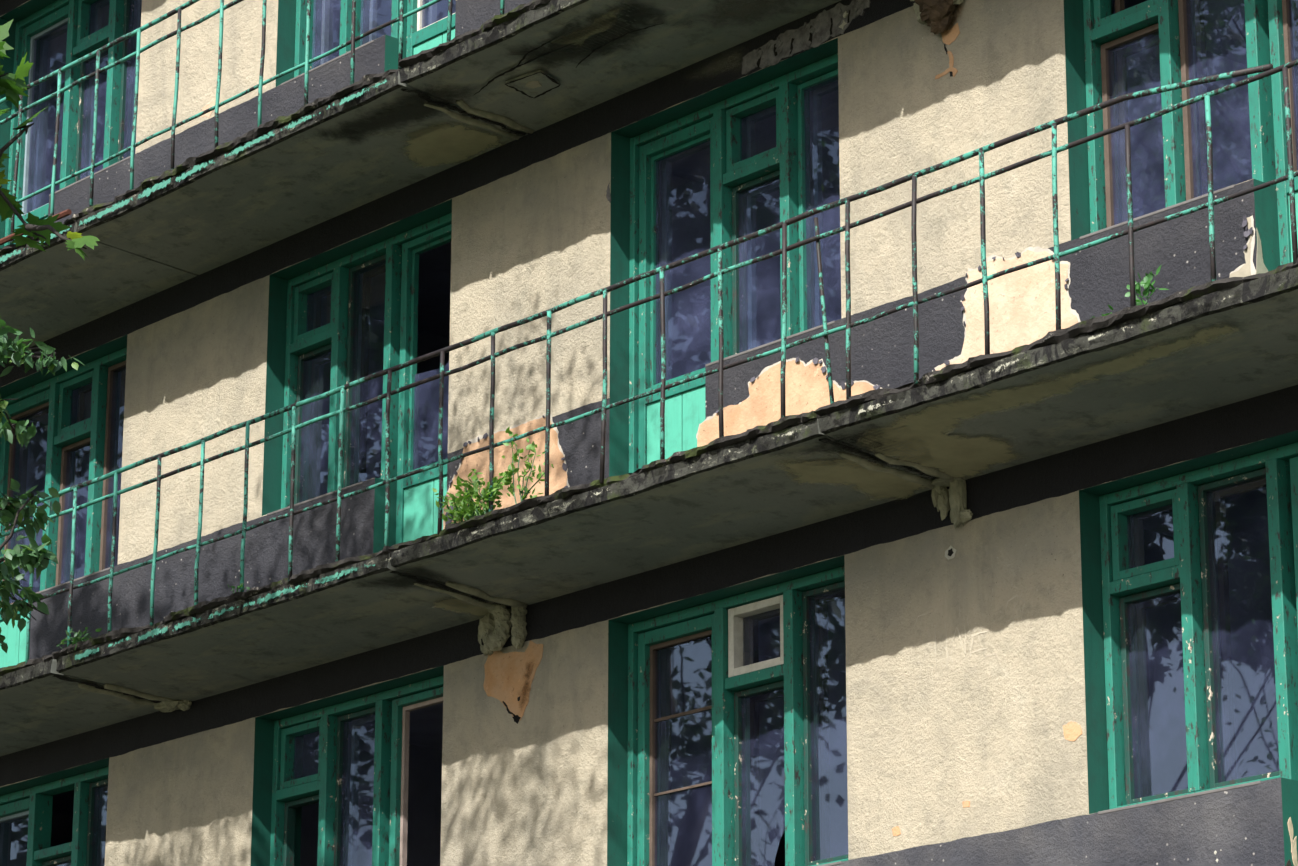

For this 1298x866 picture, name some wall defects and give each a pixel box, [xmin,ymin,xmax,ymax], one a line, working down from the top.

peeling [935,23,960,79]
flaking render [1229,215,1268,278]
peeling [932,246,1081,382]
peeling [696,356,891,452]
peeling [443,414,570,534]
peeling [483,641,544,724]